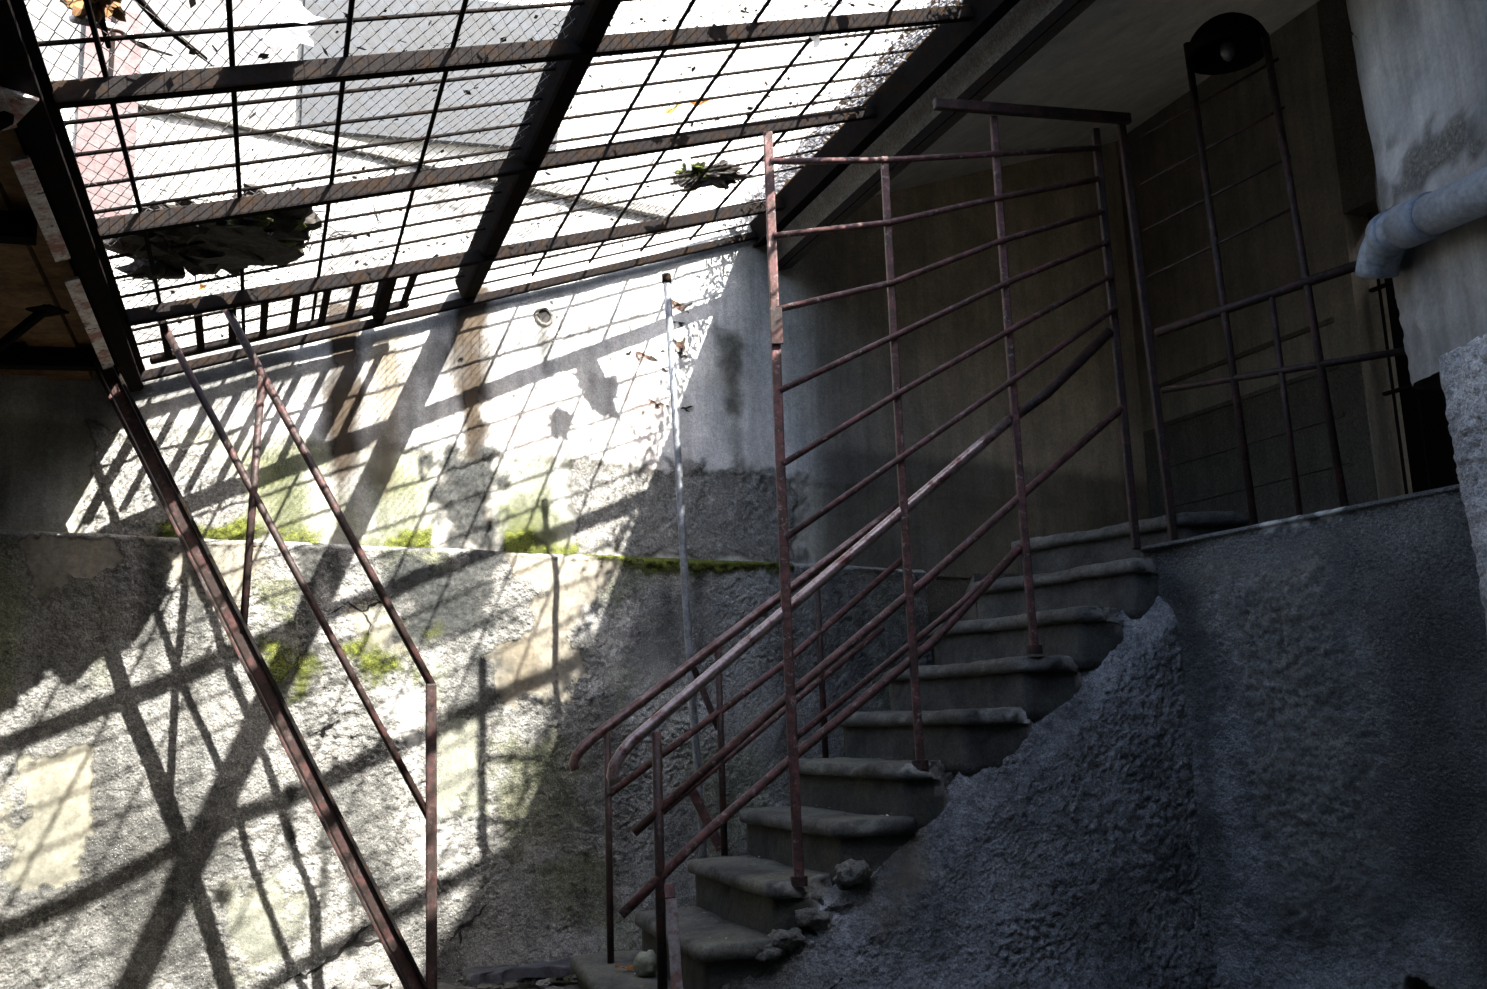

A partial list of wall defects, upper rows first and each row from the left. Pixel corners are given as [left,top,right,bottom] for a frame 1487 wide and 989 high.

spalling [674,337,687,358]